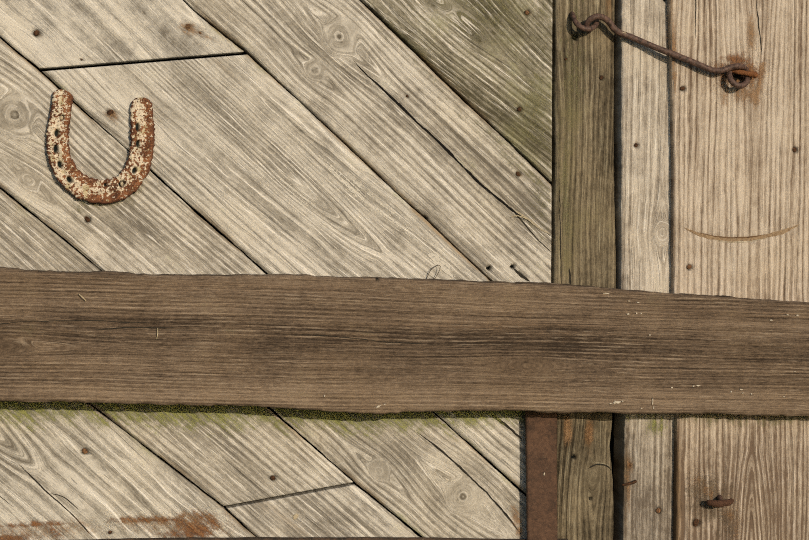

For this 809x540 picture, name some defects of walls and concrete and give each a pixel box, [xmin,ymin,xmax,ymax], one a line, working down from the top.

corrosion [720,53,764,104]
corrosion [0,521,67,540]
corrosion [124,513,219,537]